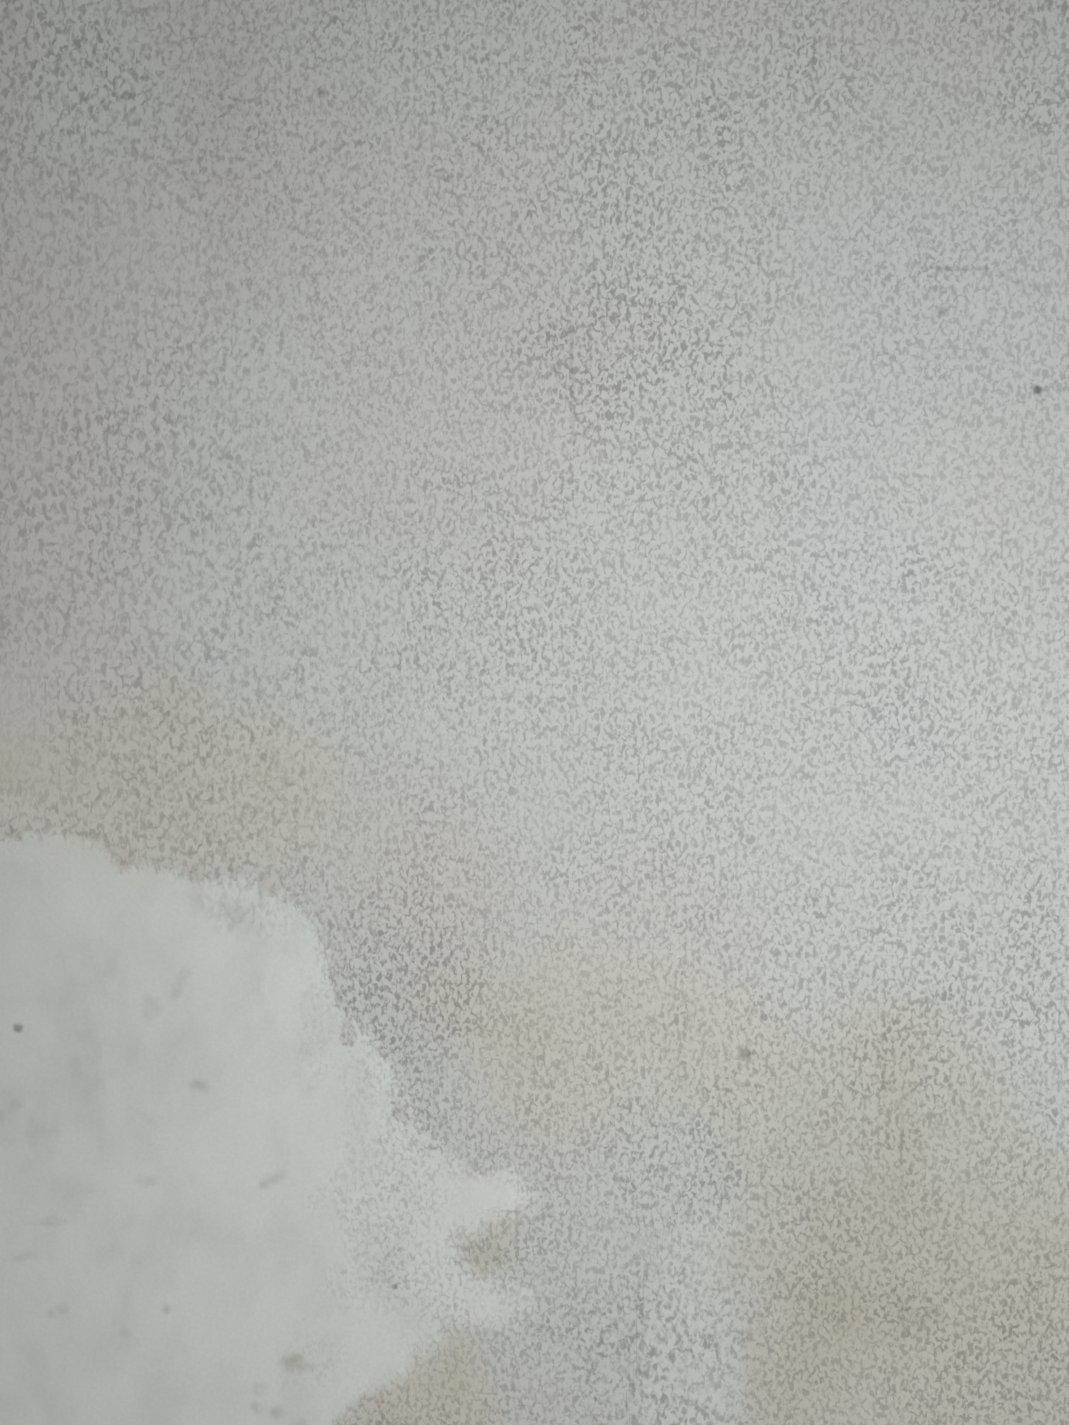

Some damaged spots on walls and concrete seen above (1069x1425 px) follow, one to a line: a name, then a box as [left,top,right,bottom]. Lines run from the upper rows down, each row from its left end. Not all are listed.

spalling [10,1022,25,1035]